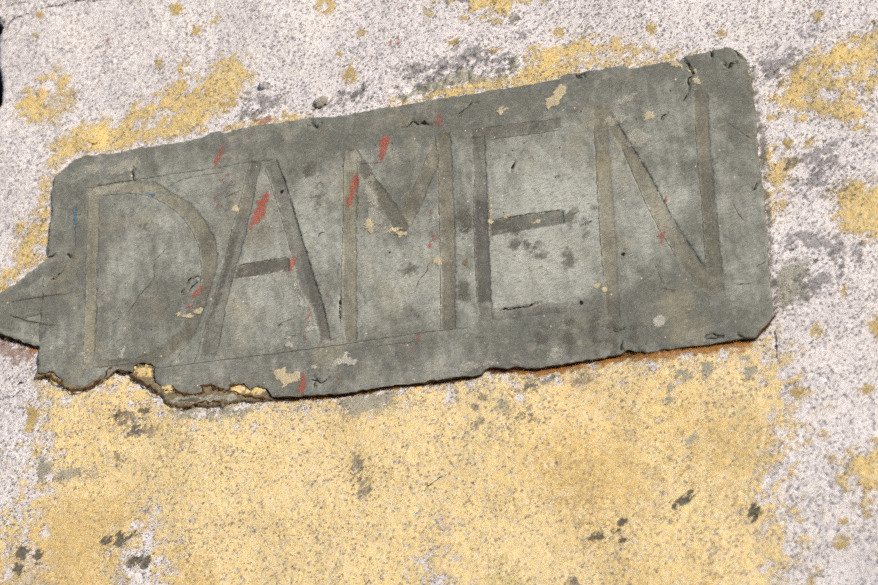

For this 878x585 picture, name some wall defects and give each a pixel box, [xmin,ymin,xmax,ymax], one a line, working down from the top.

flaking render [775,256,818,311]
peeling [740,356,758,382]
flaking render [35,364,274,422]
flaking render [328,392,396,419]
peeling [664,361,714,405]
flaking render [37,456,100,489]
peeling [672,489,697,510]
peeling [747,503,763,523]
peeling [99,530,138,547]
peeling [588,518,628,543]
peeling [12,547,43,575]
peeling [126,554,150,574]